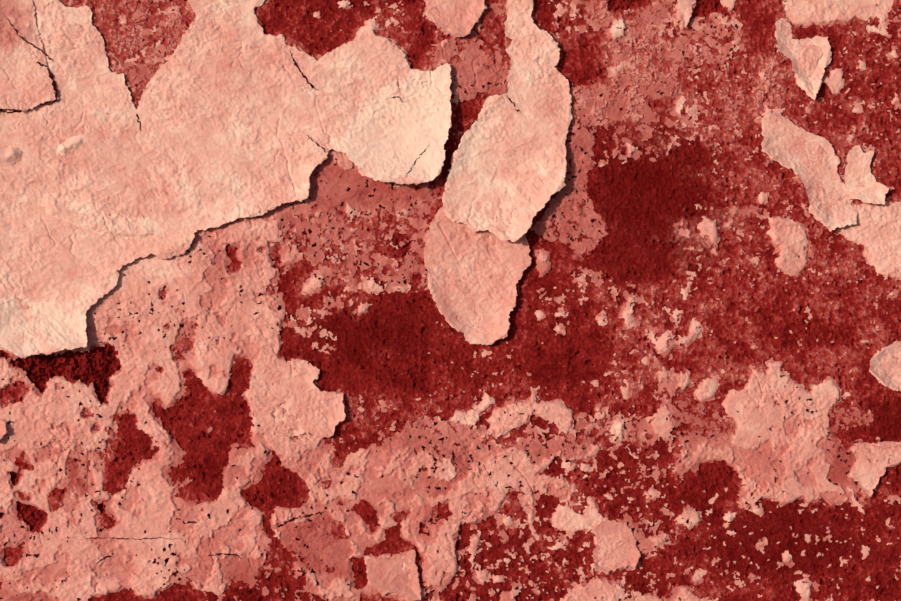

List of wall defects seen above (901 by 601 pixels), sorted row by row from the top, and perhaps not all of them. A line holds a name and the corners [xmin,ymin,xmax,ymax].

crack [0,18,58,114]
peeling [0,0,584,408]
peeling [152,0,901,505]
peeling [3,542,25,566]
peeling [8,451,67,535]
peeling [82,409,159,529]
peeling [88,450,329,601]
peeling [331,521,350,539]
peeling [351,499,380,532]
peeling [349,510,435,601]
peeling [419,502,453,535]
peeling [439,417,901,601]